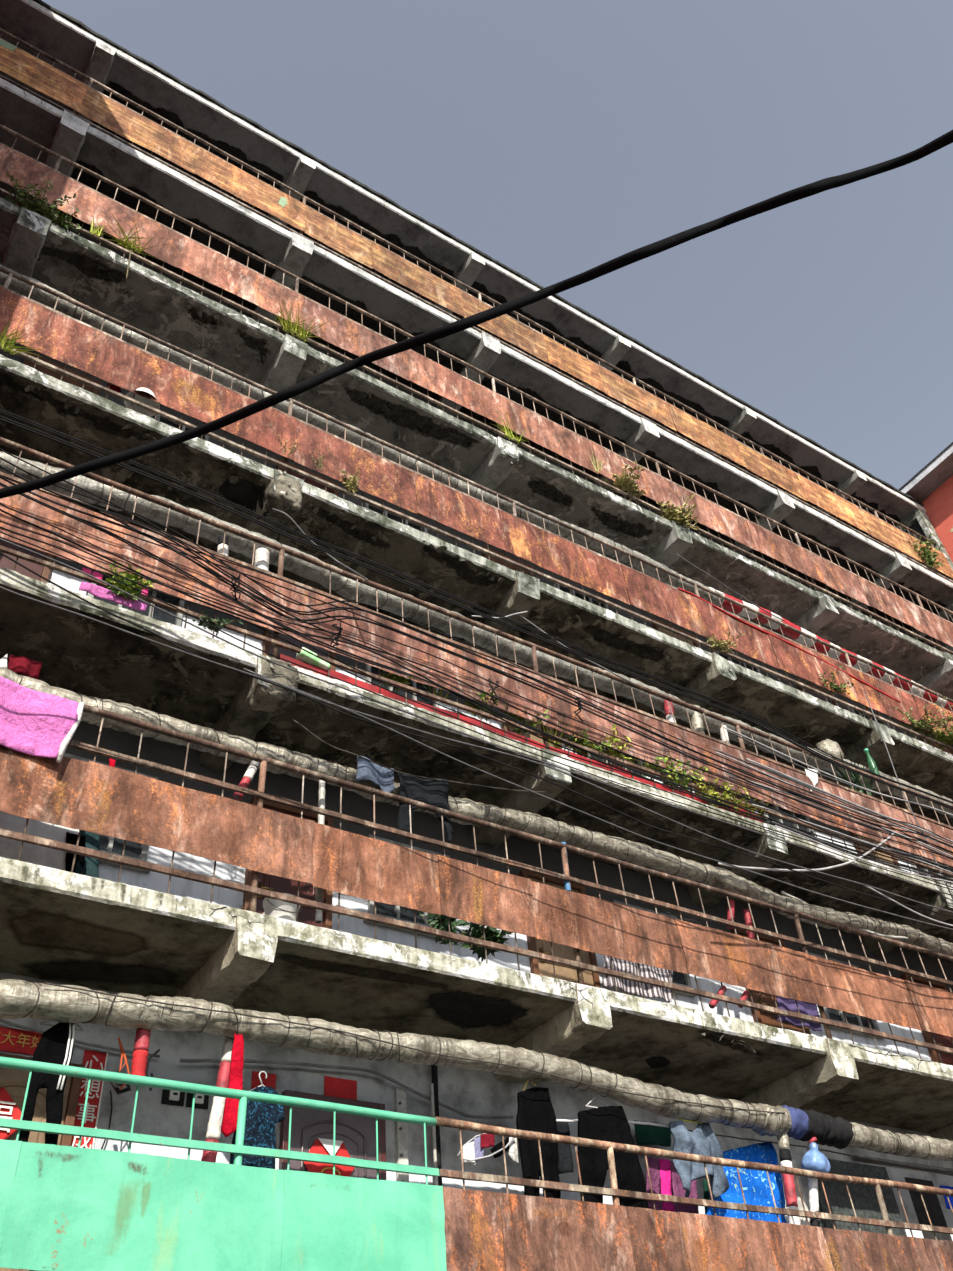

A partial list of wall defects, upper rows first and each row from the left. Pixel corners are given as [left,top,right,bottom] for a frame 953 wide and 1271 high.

water stain [9,912,178,986]